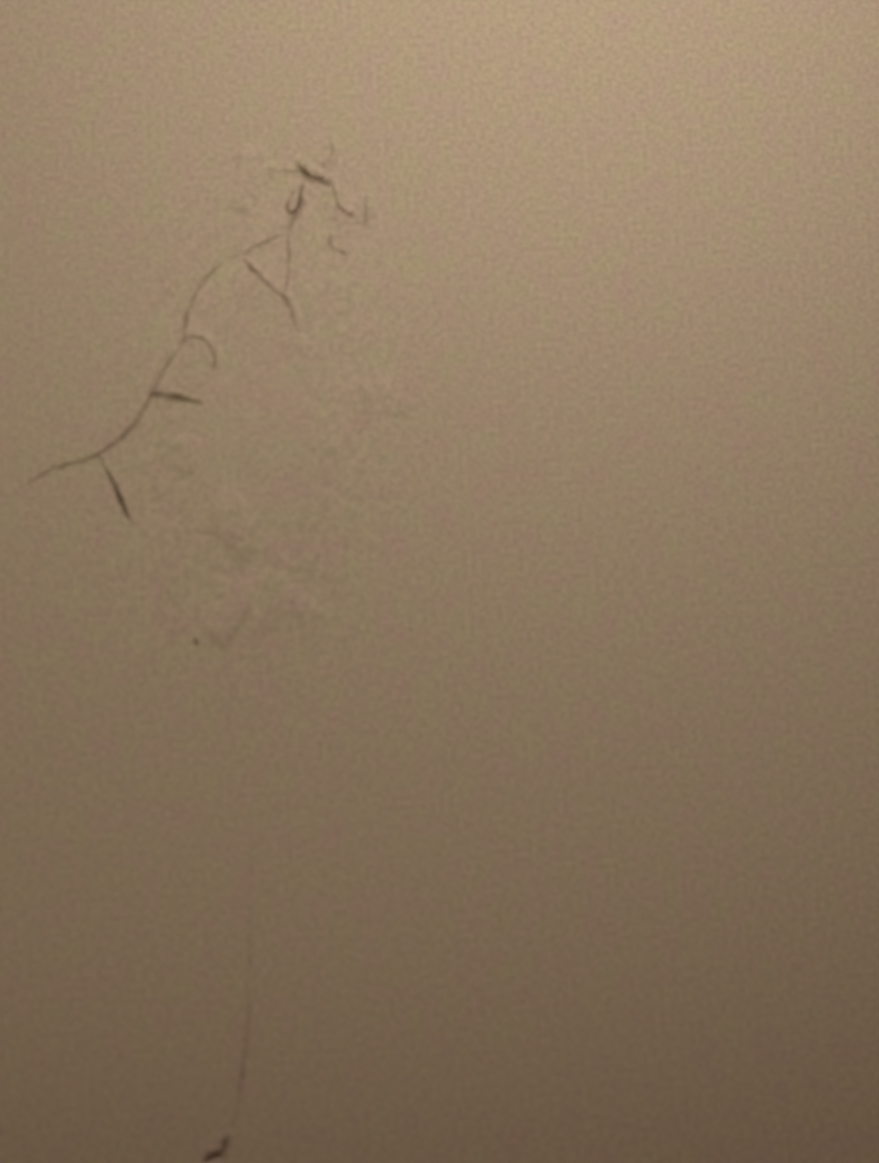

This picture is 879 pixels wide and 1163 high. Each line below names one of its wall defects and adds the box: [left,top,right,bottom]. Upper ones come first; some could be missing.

crack [115,486,128,514]